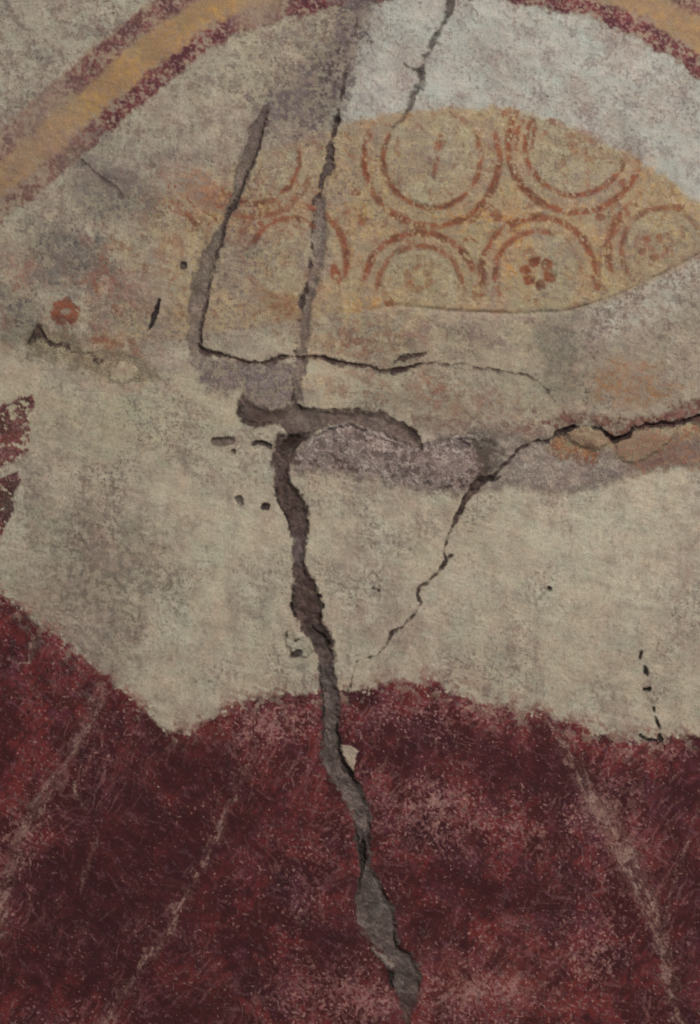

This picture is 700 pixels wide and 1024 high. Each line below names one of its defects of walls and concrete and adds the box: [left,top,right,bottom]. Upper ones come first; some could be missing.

crack [393,0,455,127]
crack [186,71,700,1023]